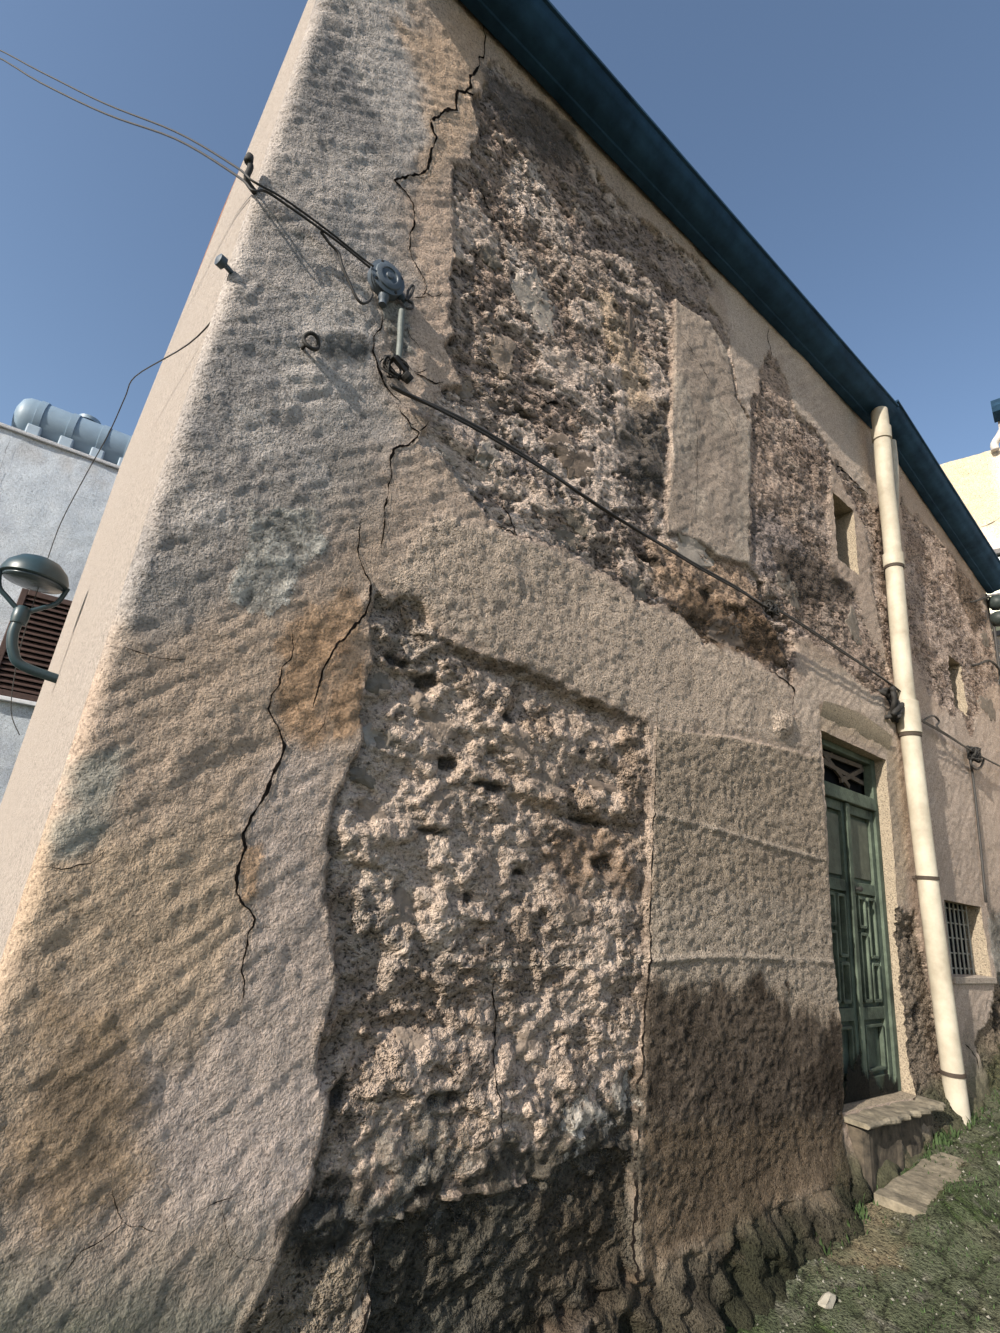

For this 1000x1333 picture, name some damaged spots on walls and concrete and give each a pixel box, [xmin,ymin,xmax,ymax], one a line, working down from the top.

crack [211,25,487,1011]
flaking render [419,60,894,697]
flaking render [900,497,999,737]
crack [347,1227,375,1333]
flaking render [244,590,655,1333]
damp [274,972,844,1333]
crack [631,713,658,1285]